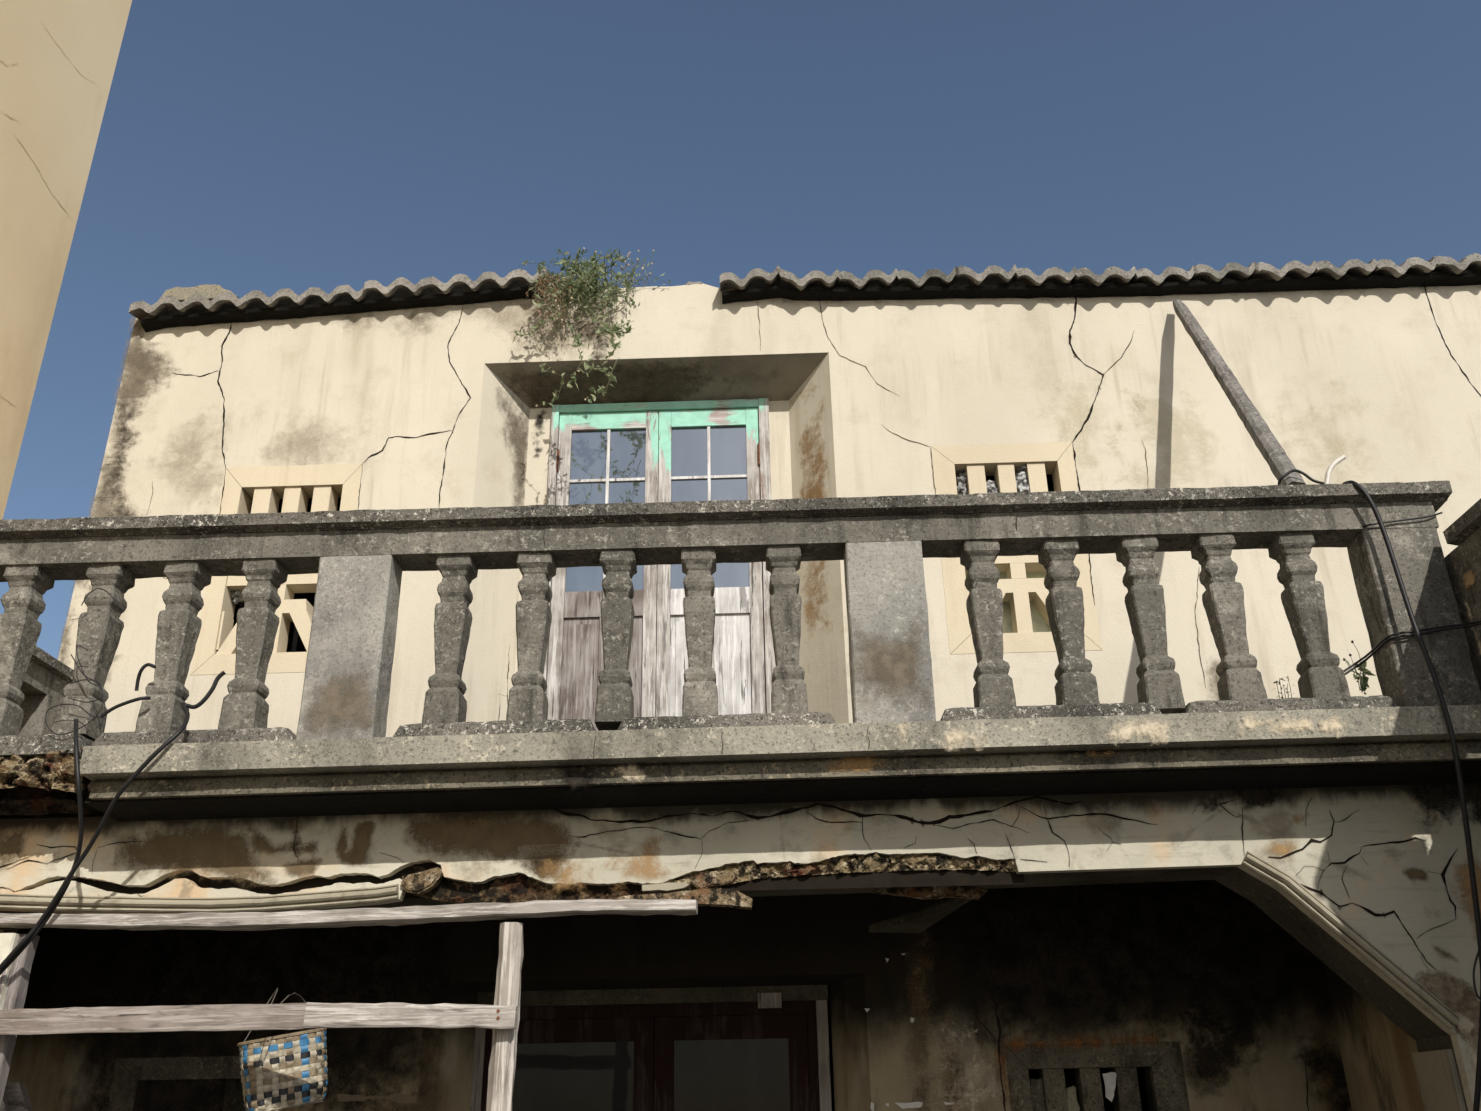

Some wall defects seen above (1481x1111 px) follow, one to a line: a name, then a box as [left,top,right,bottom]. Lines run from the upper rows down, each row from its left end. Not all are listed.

leakage [90,316,169,517]
crack [172,323,232,514]
crack [358,308,471,507]
rust [801,418,827,499]
crack [1069,297,1134,491]
crack [1424,287,1481,396]
leakage [336,821,374,865]
leakage [407,814,570,878]
spalling [401,853,1017,933]
crack [553,796,1150,868]
crack [1193,798,1468,972]
peeling [870,1102,923,1111]